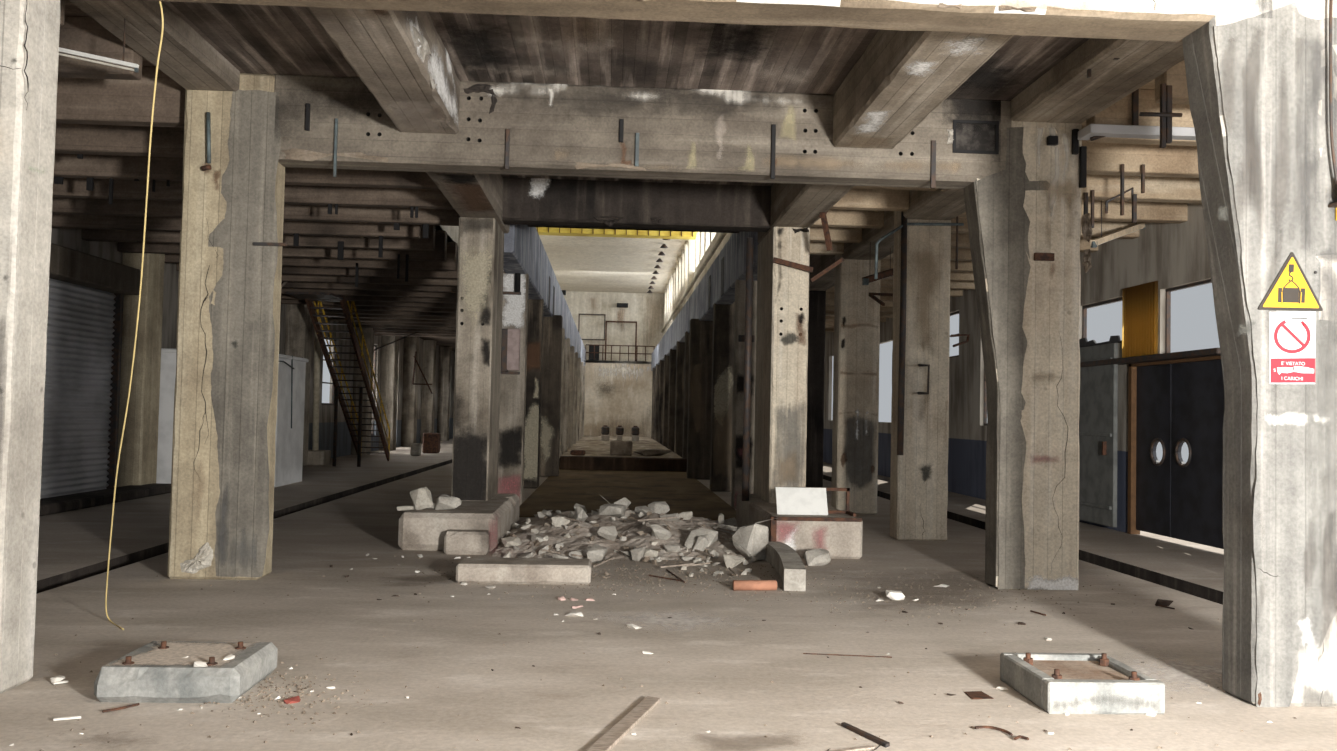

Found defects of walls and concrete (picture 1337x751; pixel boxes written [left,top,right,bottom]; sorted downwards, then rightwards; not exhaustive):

water stain [709,23,772,60]
crack [193,218,218,482]
water stain [845,411,874,487]
water stain [1305,689,1332,704]